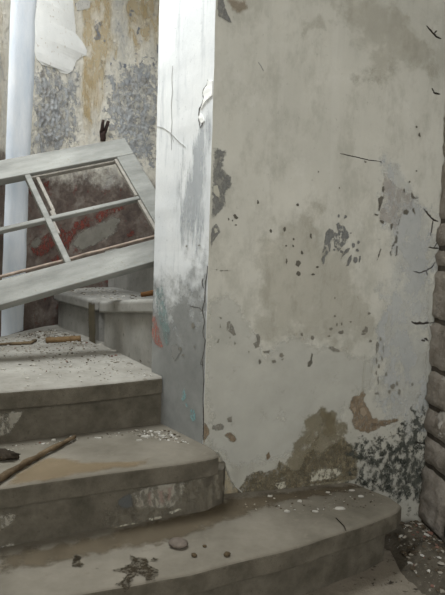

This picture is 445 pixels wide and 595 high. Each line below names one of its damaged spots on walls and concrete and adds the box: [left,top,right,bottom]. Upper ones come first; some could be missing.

peeling [34,0,90,74]
peeling [198,81,213,123]
peeling [212,148,232,215]
peeling [311,214,361,275]
crack [191,266,208,391]
crack [411,321,434,342]
peeling [204,298,398,497]
leakage [0,406,426,569]